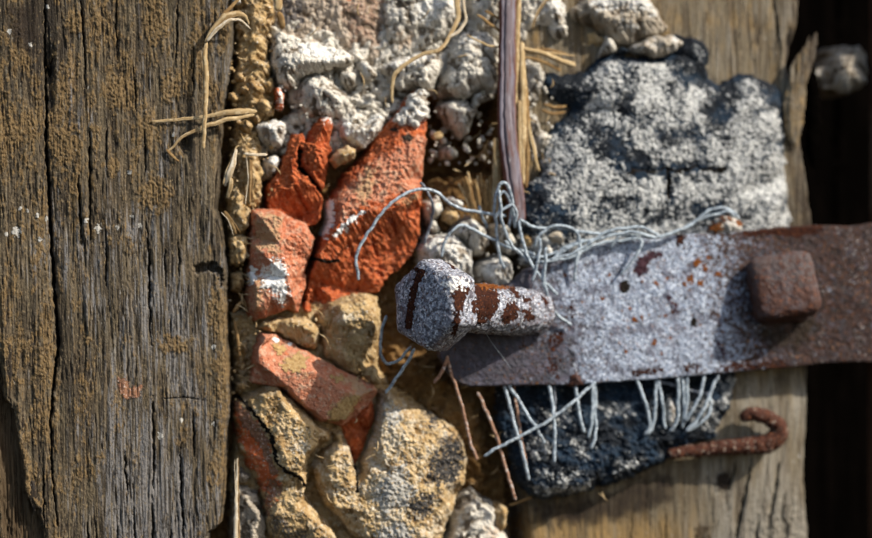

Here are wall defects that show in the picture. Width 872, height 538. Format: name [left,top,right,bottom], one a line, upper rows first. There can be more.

crack [79,0,87,89]
crack [42,0,60,529]
crack [77,119,108,286]
corrosion [738,225,824,238]
corrosion [450,282,549,336]
corrosion [632,339,664,378]
crack [726,458,787,538]